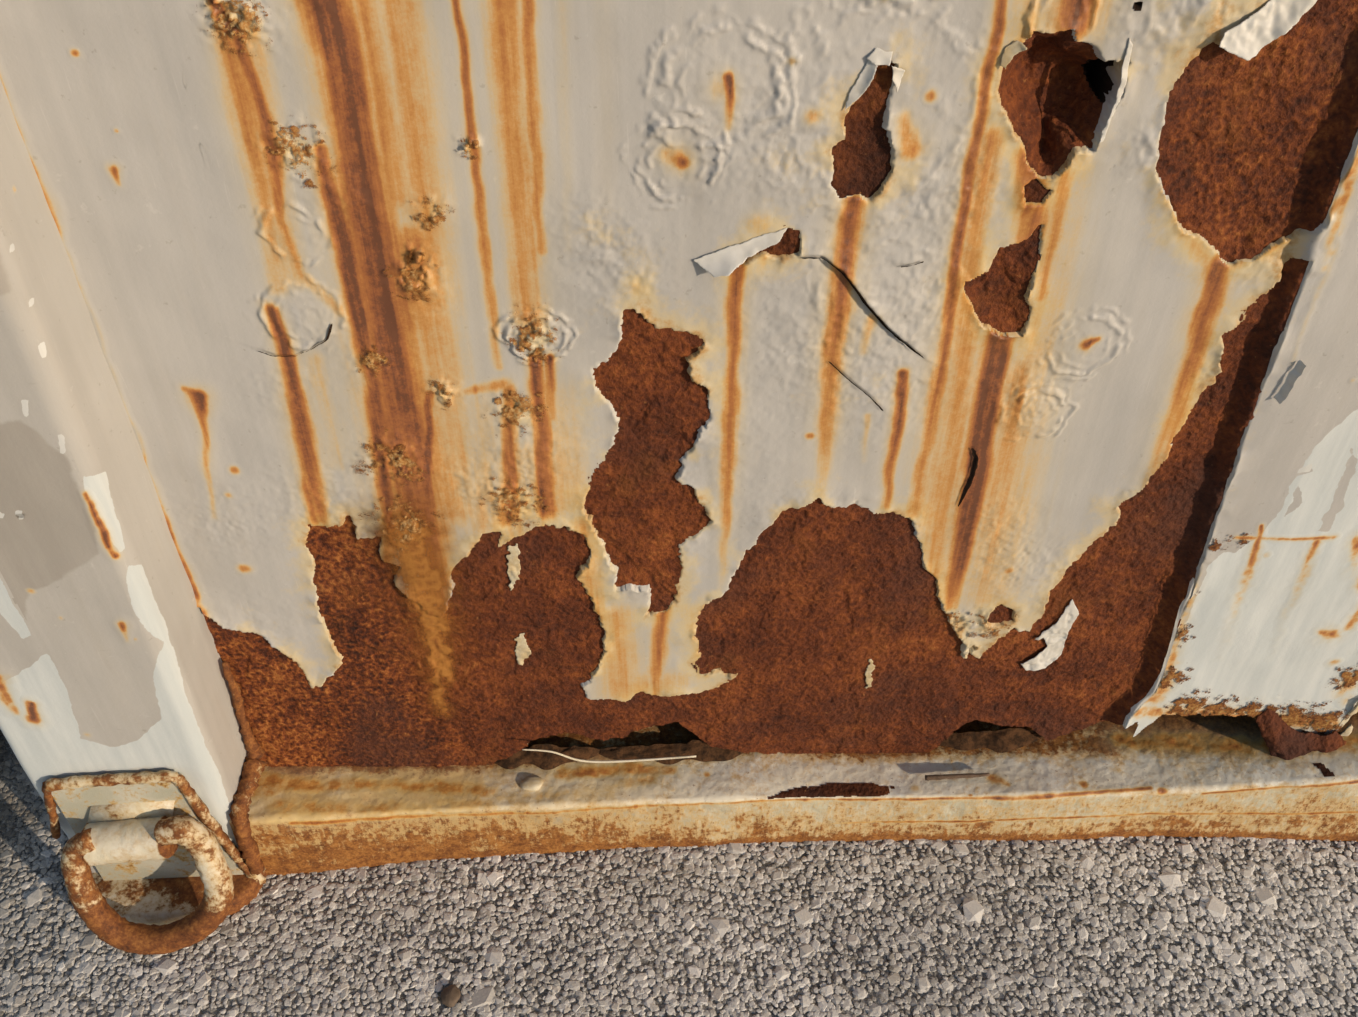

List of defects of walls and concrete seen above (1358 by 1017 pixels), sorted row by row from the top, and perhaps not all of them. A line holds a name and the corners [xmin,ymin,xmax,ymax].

rust [622,52,755,193]
peeling [693,228,787,278]
crack [802,257,923,358]
crack [828,361,883,411]
rust [163,370,247,526]
rust [76,486,131,567]
peeling [1185,406,1358,699]
rust [1212,519,1358,663]
rust [0,659,56,733]
rust [1281,704,1343,736]
rust [283,760,1175,830]
rust [1193,776,1358,798]